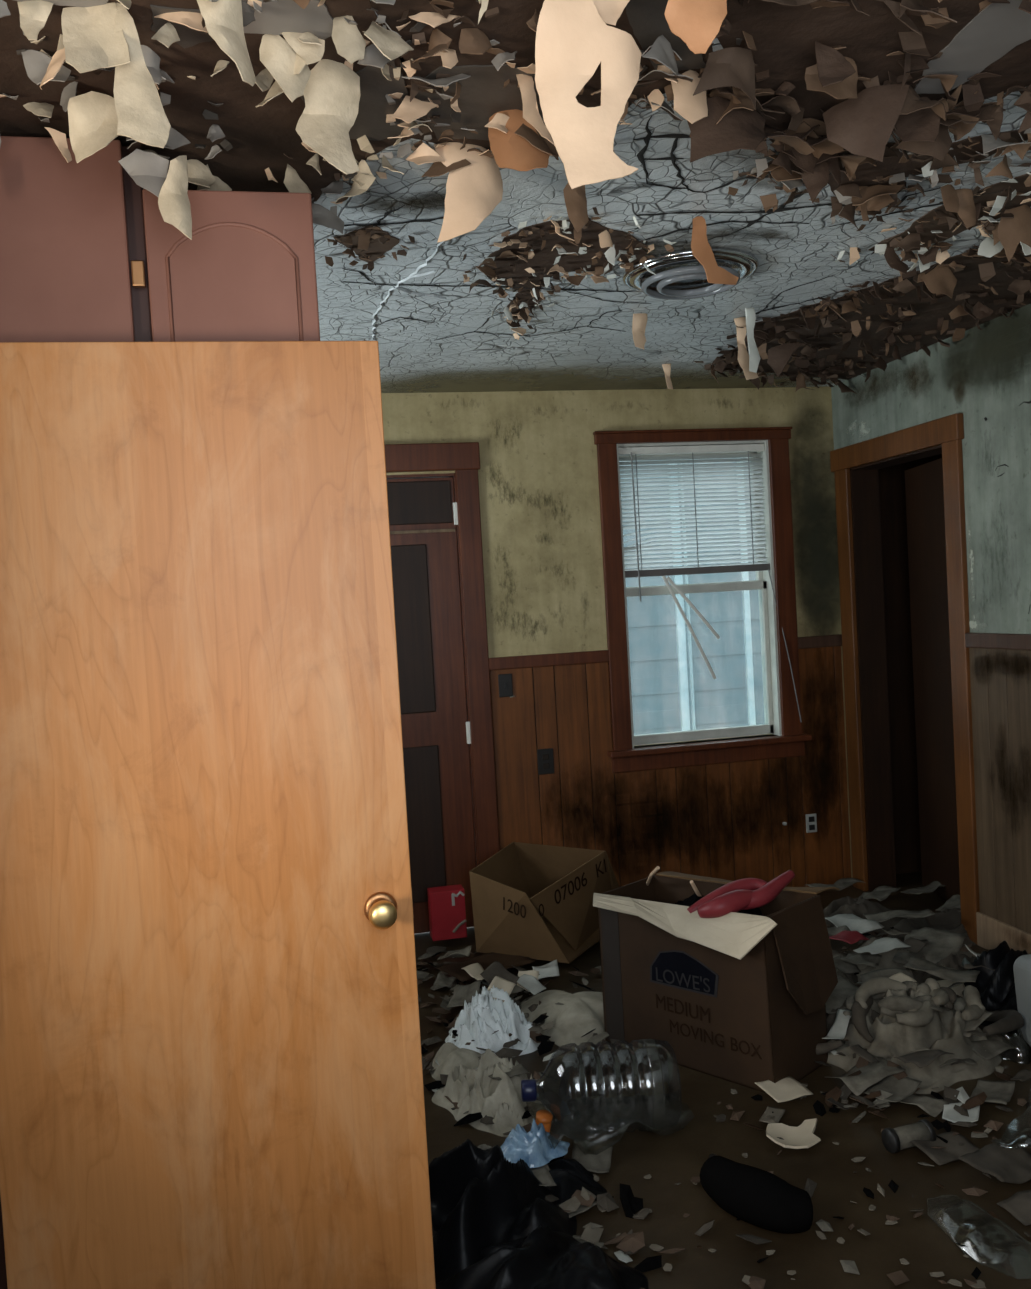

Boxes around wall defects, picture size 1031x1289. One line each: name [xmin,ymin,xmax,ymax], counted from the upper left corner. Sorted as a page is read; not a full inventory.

peeling [0,0,1031,394]
crack [633,115,943,241]
crack [343,205,651,341]
crack [727,275,839,324]